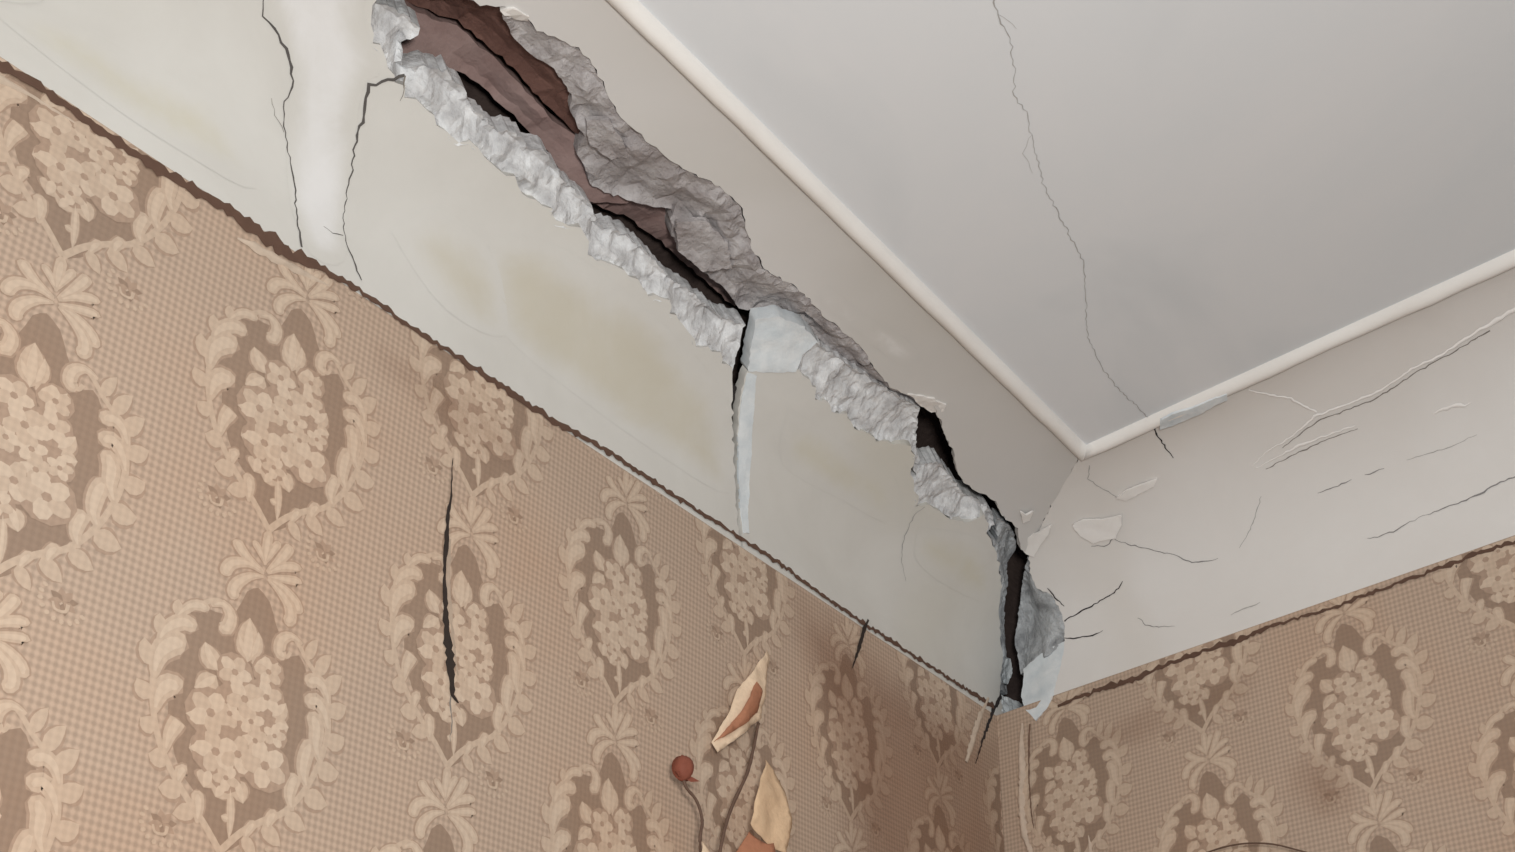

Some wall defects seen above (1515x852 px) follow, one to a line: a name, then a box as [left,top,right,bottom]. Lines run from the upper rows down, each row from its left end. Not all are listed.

crack [262,0,1173,721]
spalling [737,305,818,534]
crack [1319,435,1476,493]
peeling [1020,510,1052,557]
peeling [1072,478,1158,544]
crack [1096,497,1261,563]
crack [1369,477,1515,539]